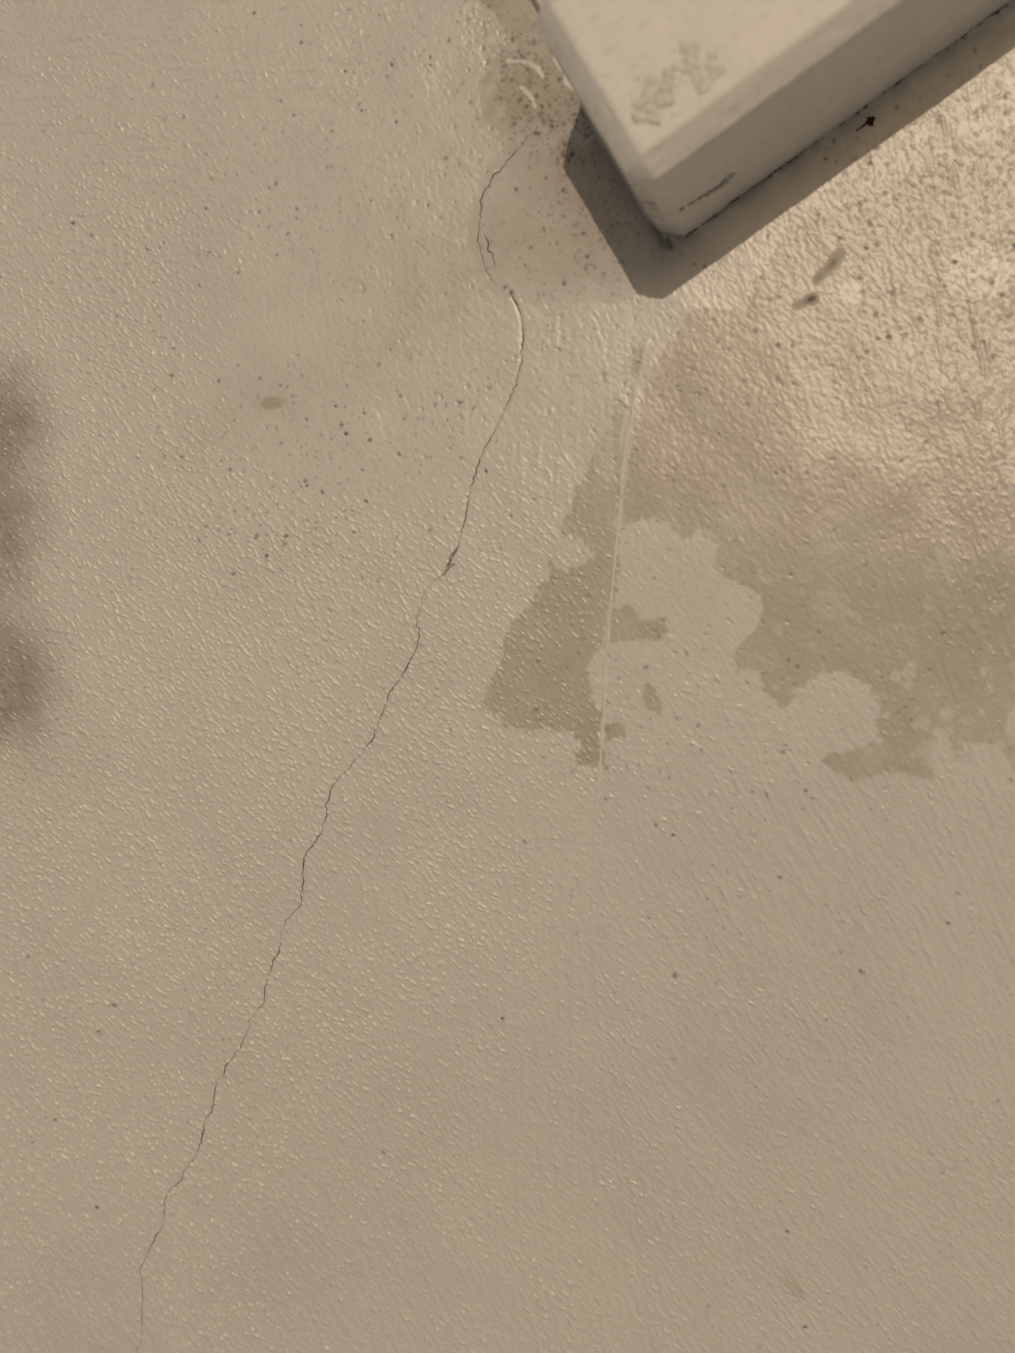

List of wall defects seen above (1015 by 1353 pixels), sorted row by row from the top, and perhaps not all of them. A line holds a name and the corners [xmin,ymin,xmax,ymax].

crack [136,134,536,1352]
leakage [480,46,1015,784]